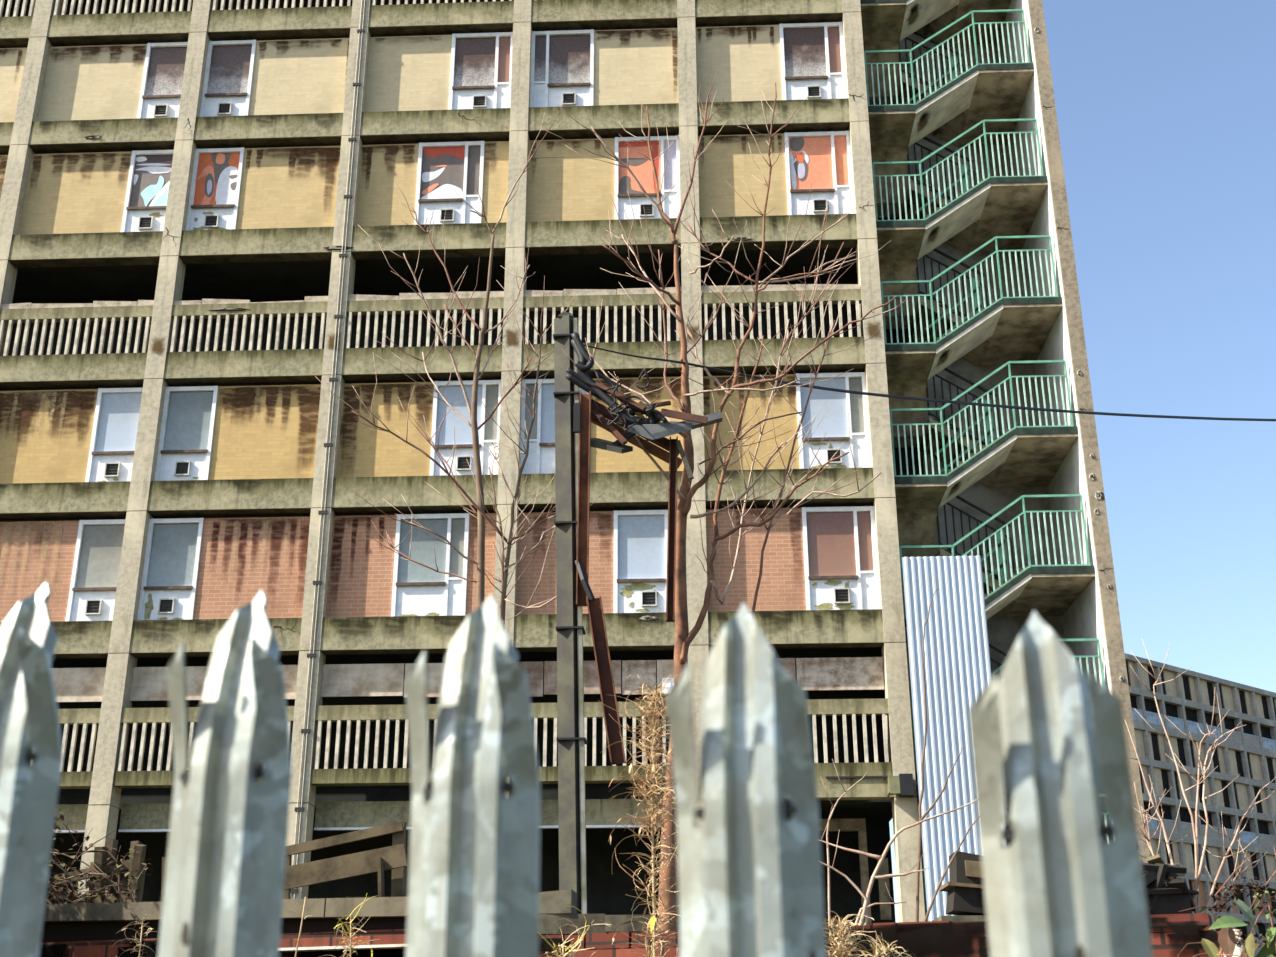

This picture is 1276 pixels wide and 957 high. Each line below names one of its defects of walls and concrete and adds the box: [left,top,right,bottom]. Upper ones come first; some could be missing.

damp [33,153,131,178]
damp [246,147,340,196]
damp [701,135,782,152]
damp [0,391,96,438]
damp [220,386,321,462]
damp [211,518,309,577]